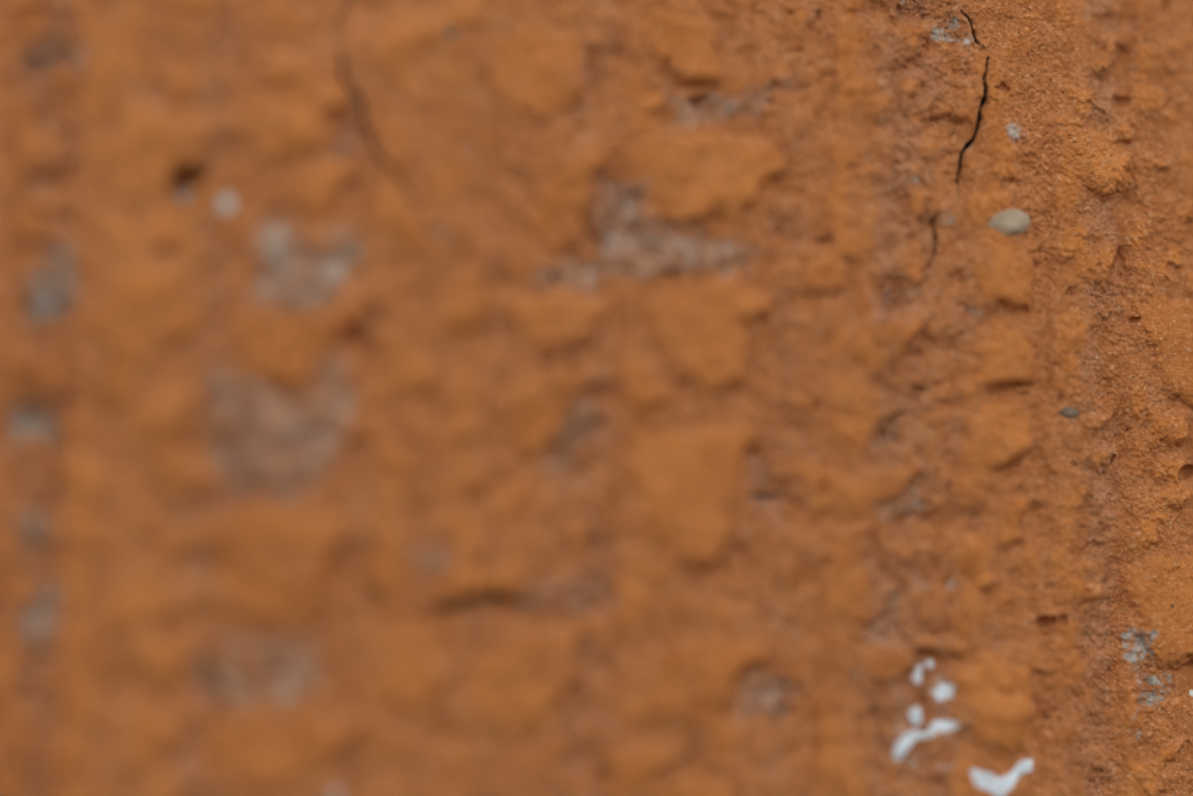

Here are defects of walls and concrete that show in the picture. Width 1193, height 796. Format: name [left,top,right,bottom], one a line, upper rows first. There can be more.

crack [929,0,991,264]
crack [428,592,603,616]